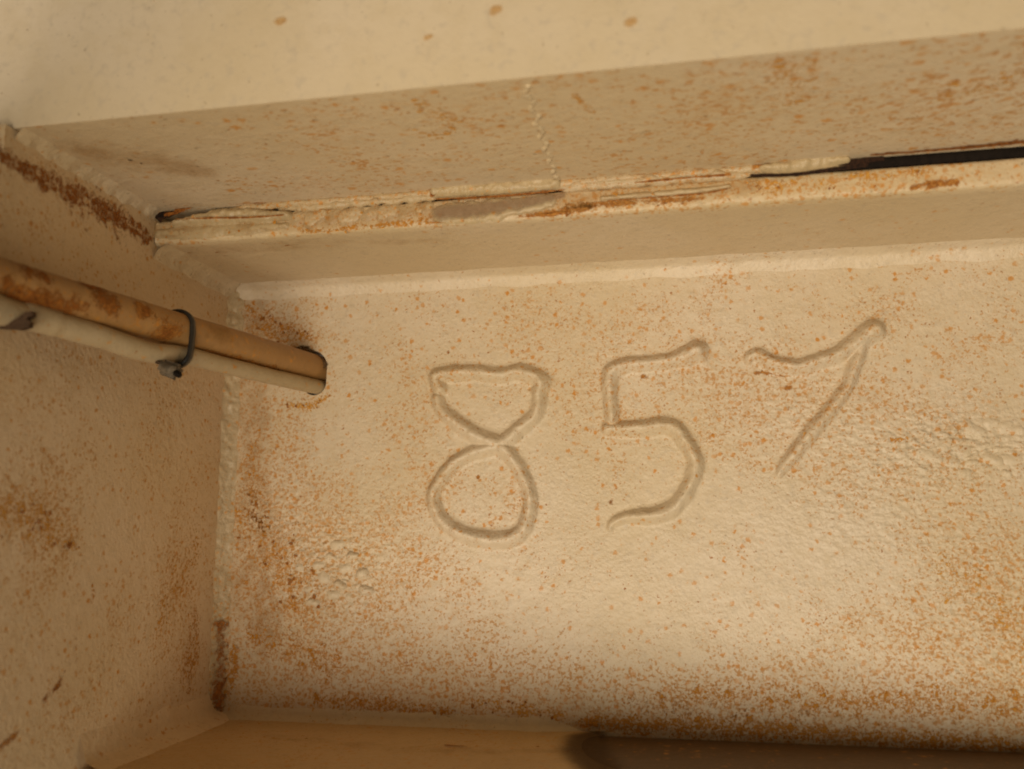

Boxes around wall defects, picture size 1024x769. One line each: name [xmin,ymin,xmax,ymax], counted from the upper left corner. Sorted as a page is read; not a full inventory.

crack [834,139,1024,172]
corrosion [0,148,152,245]
peeling [154,202,294,240]
peeling [428,179,566,226]
corrosion [746,167,960,197]
corrosion [211,429,342,712]
corrosion [313,673,1024,752]